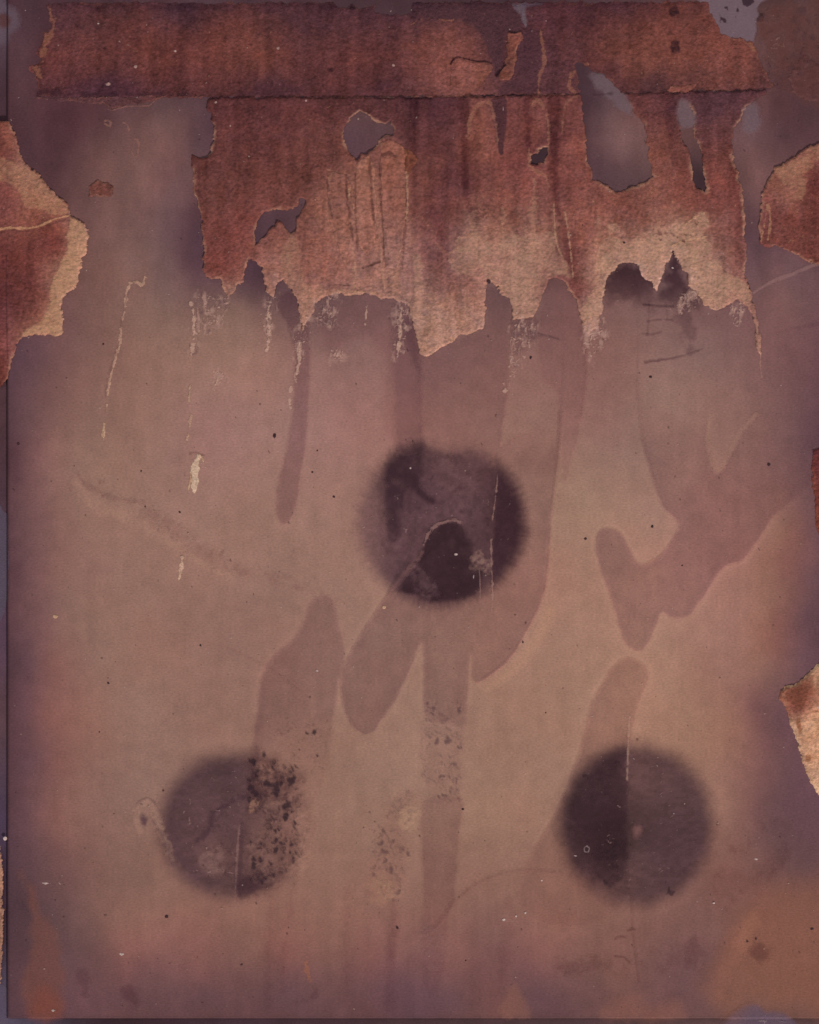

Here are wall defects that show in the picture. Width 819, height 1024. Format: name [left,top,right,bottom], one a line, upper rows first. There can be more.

leakage [247,293,558,884]
leakage [534,445,783,860]